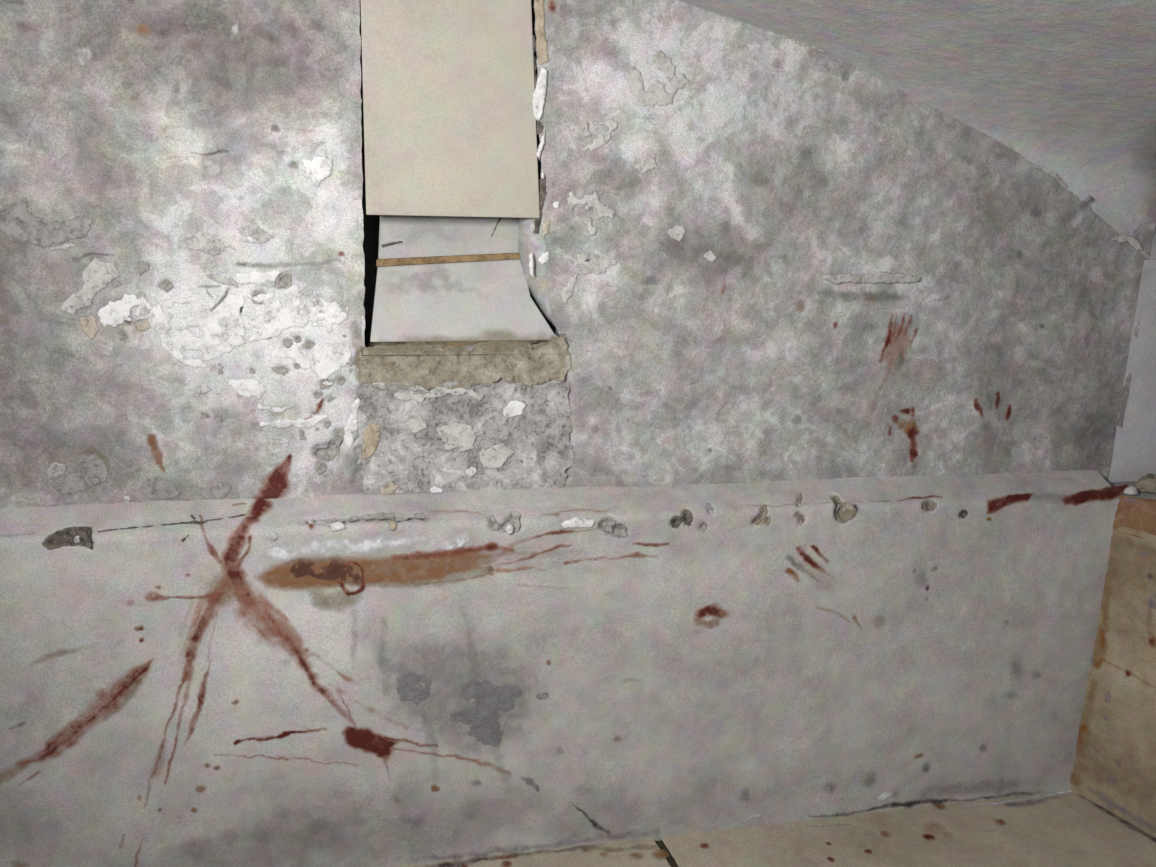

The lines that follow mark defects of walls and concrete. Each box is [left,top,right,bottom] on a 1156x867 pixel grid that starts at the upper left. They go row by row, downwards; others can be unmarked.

spalling [0,198,574,495]
leakage [147,454,497,783]